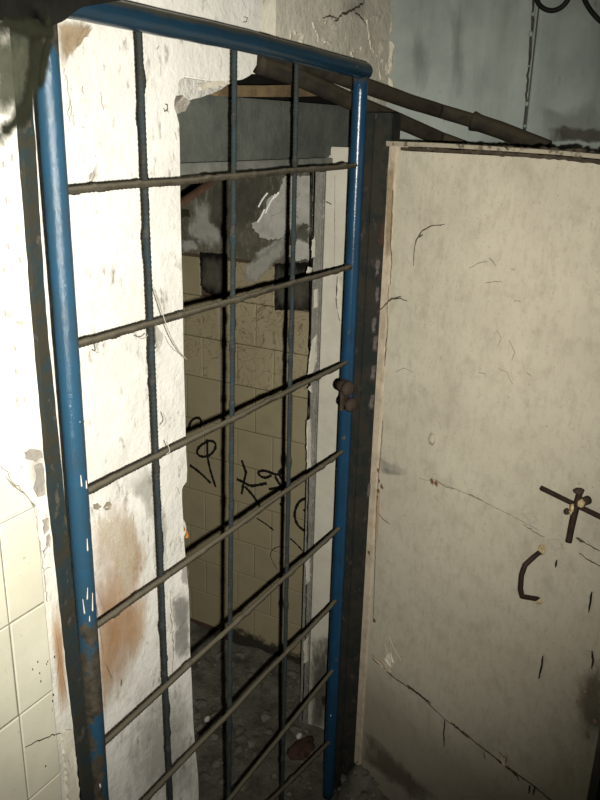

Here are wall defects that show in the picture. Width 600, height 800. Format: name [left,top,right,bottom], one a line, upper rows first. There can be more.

crack [323,0,367,26]
flaking render [164,78,232,114]
damp [555,126,600,143]
peeling [181,175,318,311]
peeling [307,334,318,375]
rust [101,576,143,683]
crack [371,654,551,800]